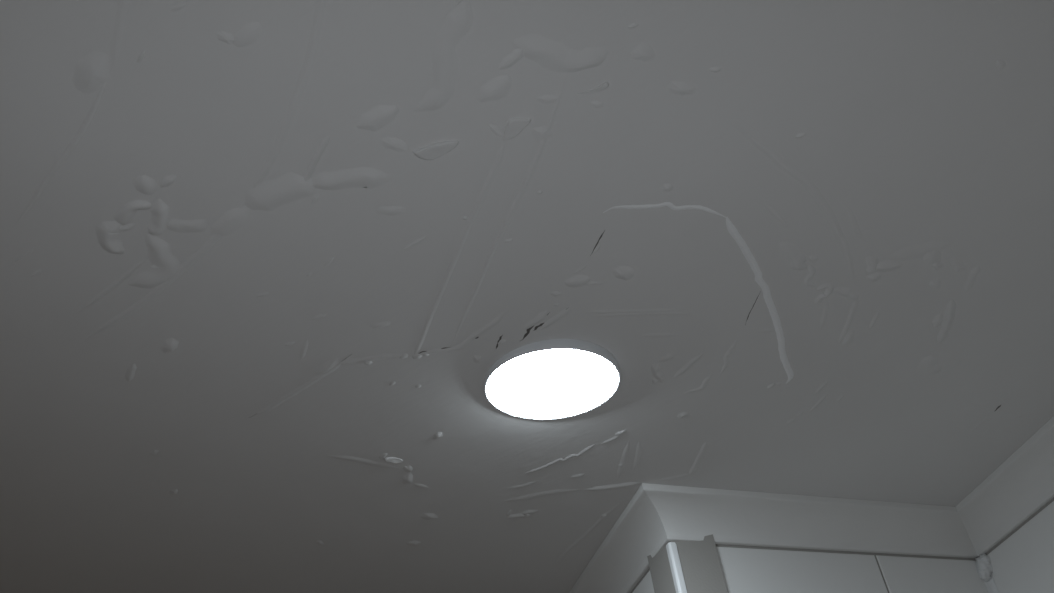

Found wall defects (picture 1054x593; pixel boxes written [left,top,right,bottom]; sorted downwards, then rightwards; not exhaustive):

crack [496,303,571,349]